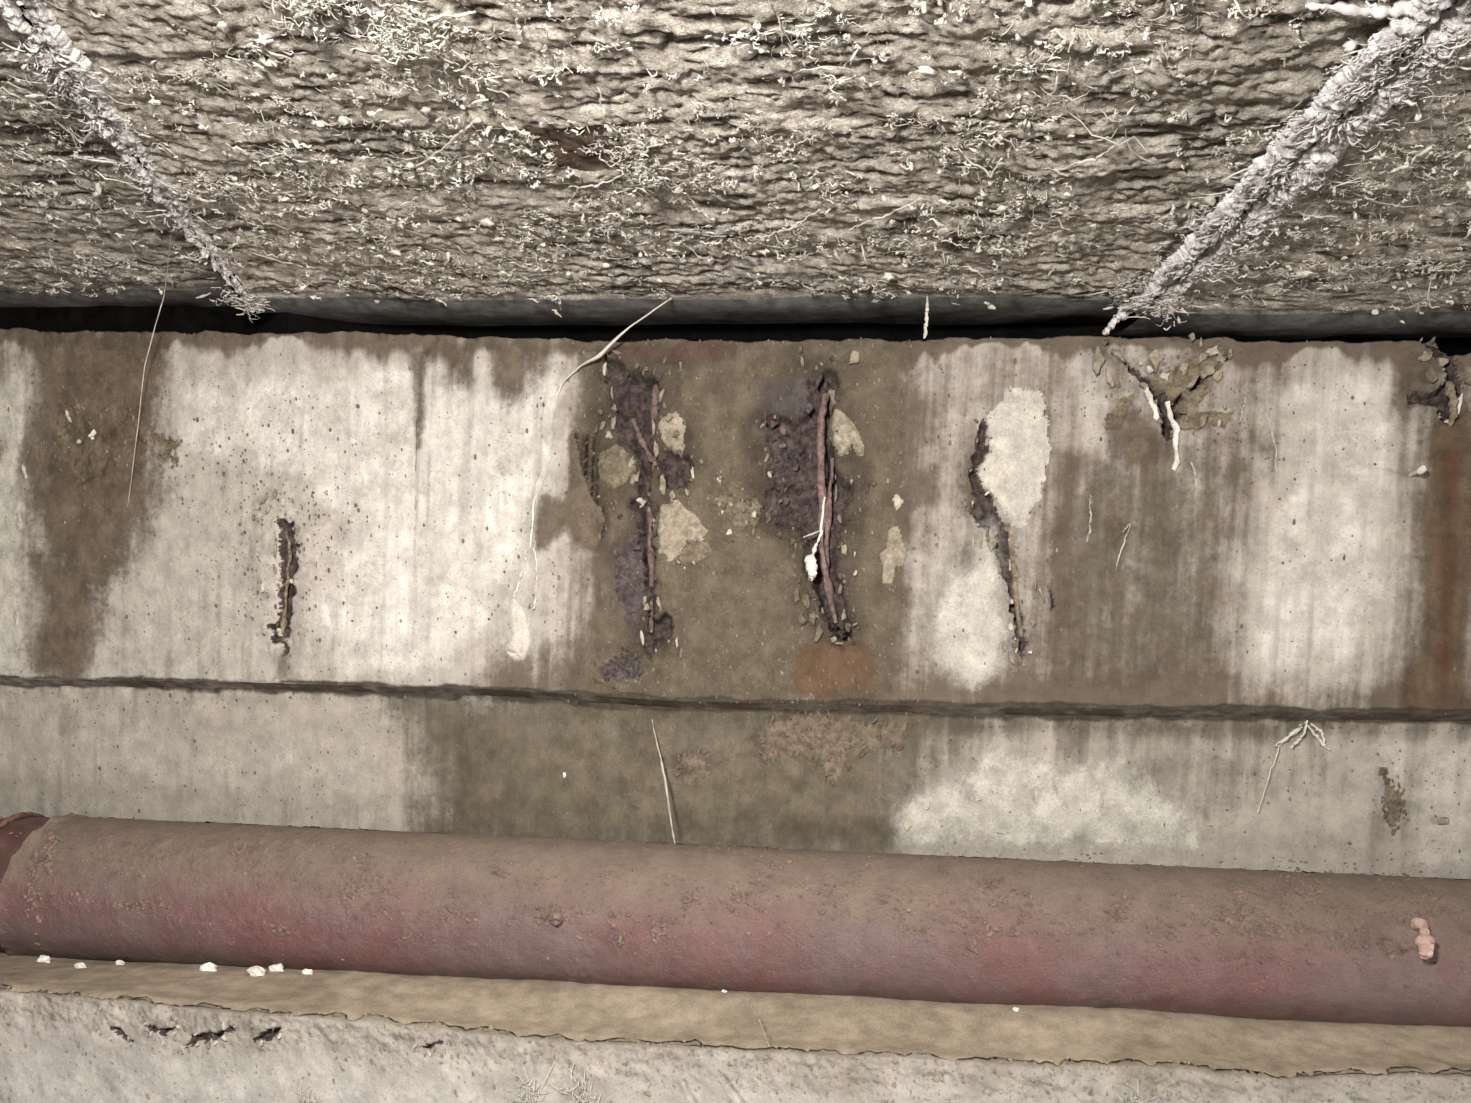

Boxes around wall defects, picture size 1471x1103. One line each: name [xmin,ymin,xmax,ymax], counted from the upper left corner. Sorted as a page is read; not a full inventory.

spalling [594,344,877,689]
water stain [0,331,1471,853]
spalling [1092,333,1236,471]
rust [1404,407,1471,710]
spalling [1407,336,1471,427]